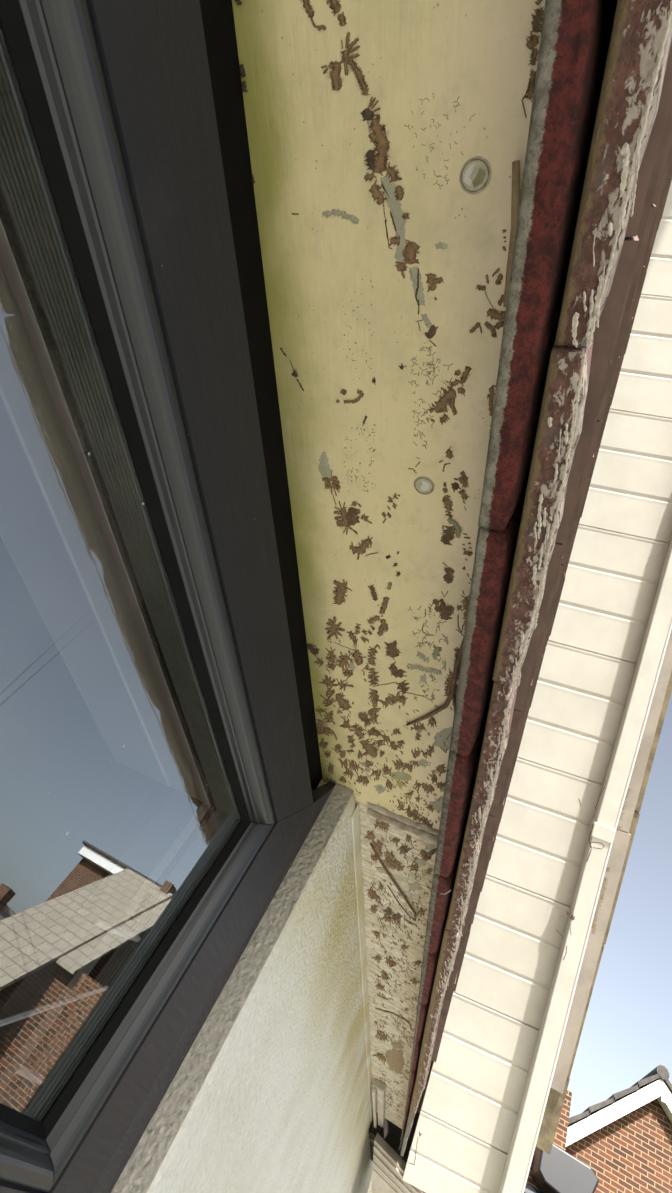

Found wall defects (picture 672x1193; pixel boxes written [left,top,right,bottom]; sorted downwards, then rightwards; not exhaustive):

peeling [465,164,475,186]
peeling [322,209,360,224]
peeling [380,175,432,328]
peeling [318,452,332,478]
peeling [409,634,448,700]
peeling [433,727,452,753]
peeling [397,796,443,828]
peeling [373,1031,404,1074]